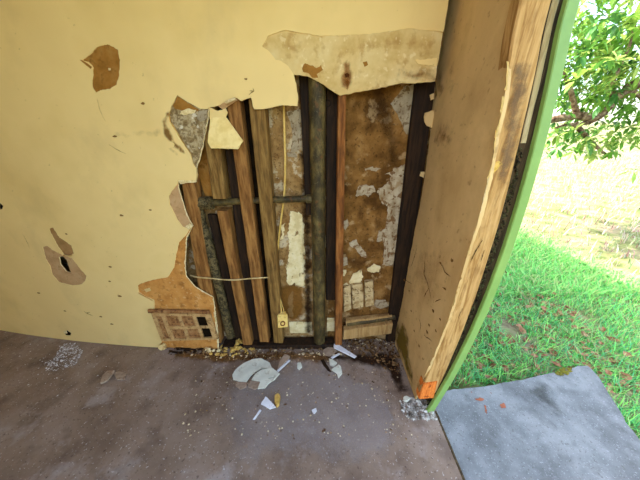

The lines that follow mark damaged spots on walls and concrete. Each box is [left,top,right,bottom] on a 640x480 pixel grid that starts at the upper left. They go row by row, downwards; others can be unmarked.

peeling [80,44,120,92]
spalling [262,14,447,339]
peeling [43,228,86,285]
peeling [138,181,226,349]
leakage [175,325,412,391]